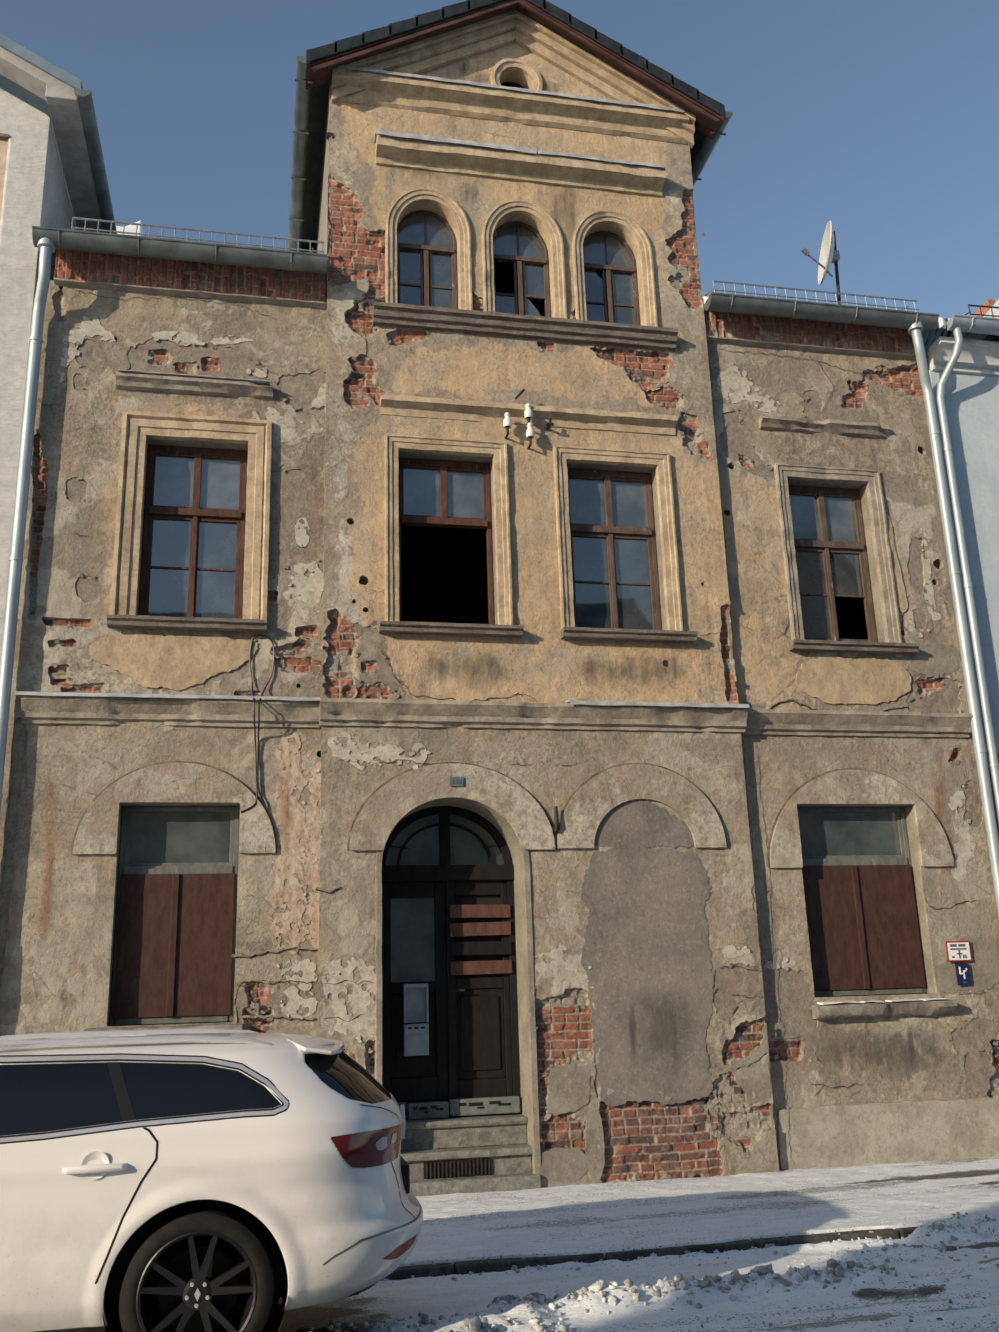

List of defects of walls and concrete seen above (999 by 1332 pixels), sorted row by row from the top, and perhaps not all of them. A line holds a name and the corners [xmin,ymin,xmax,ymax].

flaking render [327,175,431,346]
peeling [52,286,326,441]
flaking render [343,355,385,409]
flaking render [591,345,780,479]
flaking render [841,363,924,411]
flaking render [29,428,91,647]
flaking render [48,663,105,693]
flaking render [268,469,404,700]
flaking render [719,601,737,701]
crack [768,698,819,710]
peeling [233,731,430,1078]
flaking render [532,944,819,1183]